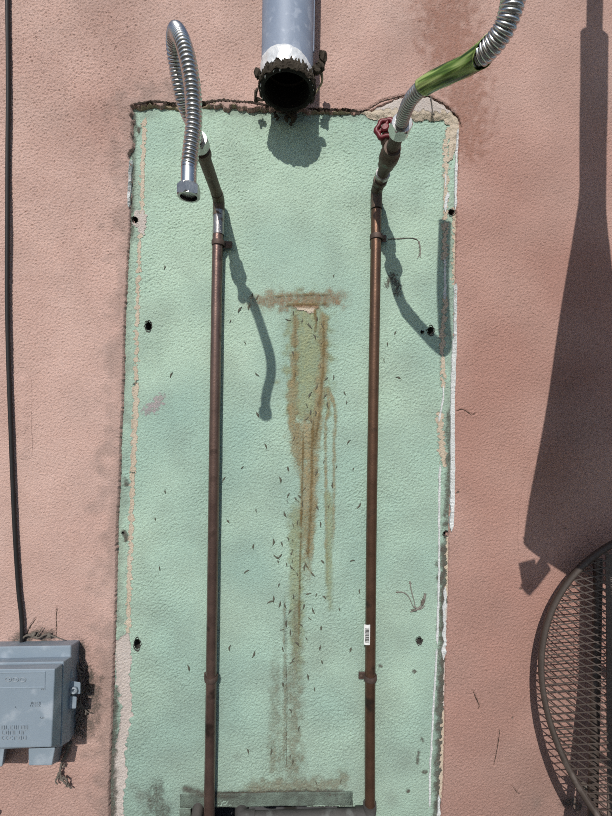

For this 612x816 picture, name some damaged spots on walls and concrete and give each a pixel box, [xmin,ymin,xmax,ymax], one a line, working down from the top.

flaking render [202,67,269,113]
peeling [308,96,403,120]
peeling [385,272,401,296]
corrosion [249,290,341,661]
peeling [411,97,460,816]
water stain [74,643,100,738]
water stain [110,691,119,816]